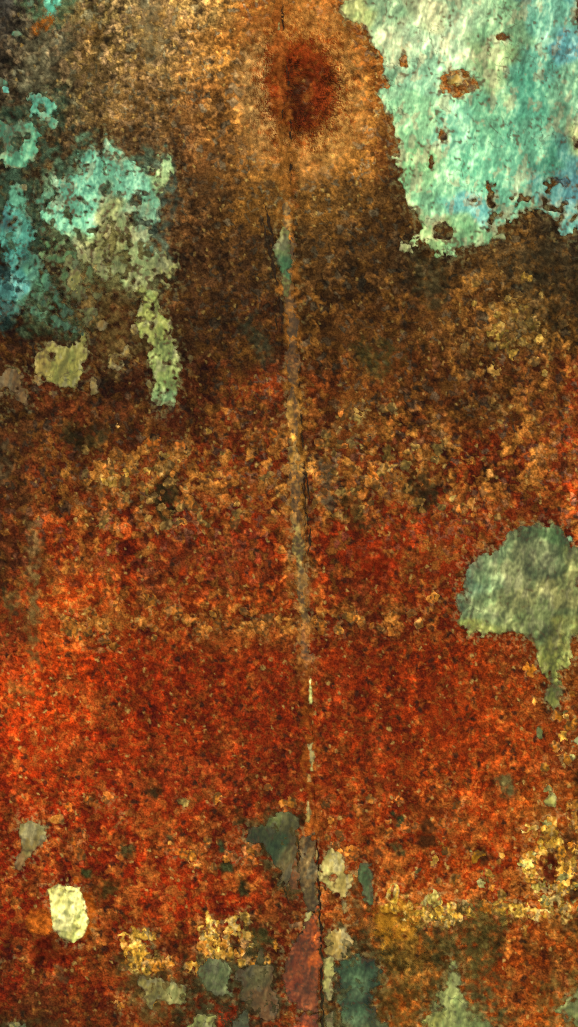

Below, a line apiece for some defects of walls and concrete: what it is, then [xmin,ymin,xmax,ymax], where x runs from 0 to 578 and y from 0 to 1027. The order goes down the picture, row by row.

rust [241,3,361,174]
peeling [339,0,578,258]
peeling [0,92,183,406]
rust [465,272,569,378]
rust [80,436,243,532]
rust [305,406,476,520]
peeling [455,523,578,709]
peeling [47,884,89,943]
rust [167,837,262,871]
peeling [316,848,374,914]
rust [517,829,578,912]
peeling [322,927,388,1027]